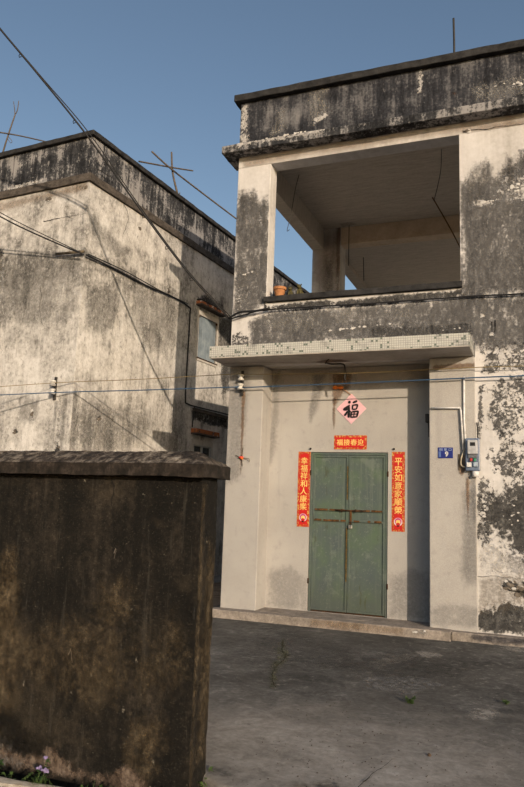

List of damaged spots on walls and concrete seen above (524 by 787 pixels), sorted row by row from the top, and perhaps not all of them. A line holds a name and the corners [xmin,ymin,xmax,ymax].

peeling [473,177,524,207]
damp [198,150,524,568]
damp [192,411,228,429]
corrosion [314,508,382,582]
flaking render [503,580,524,598]